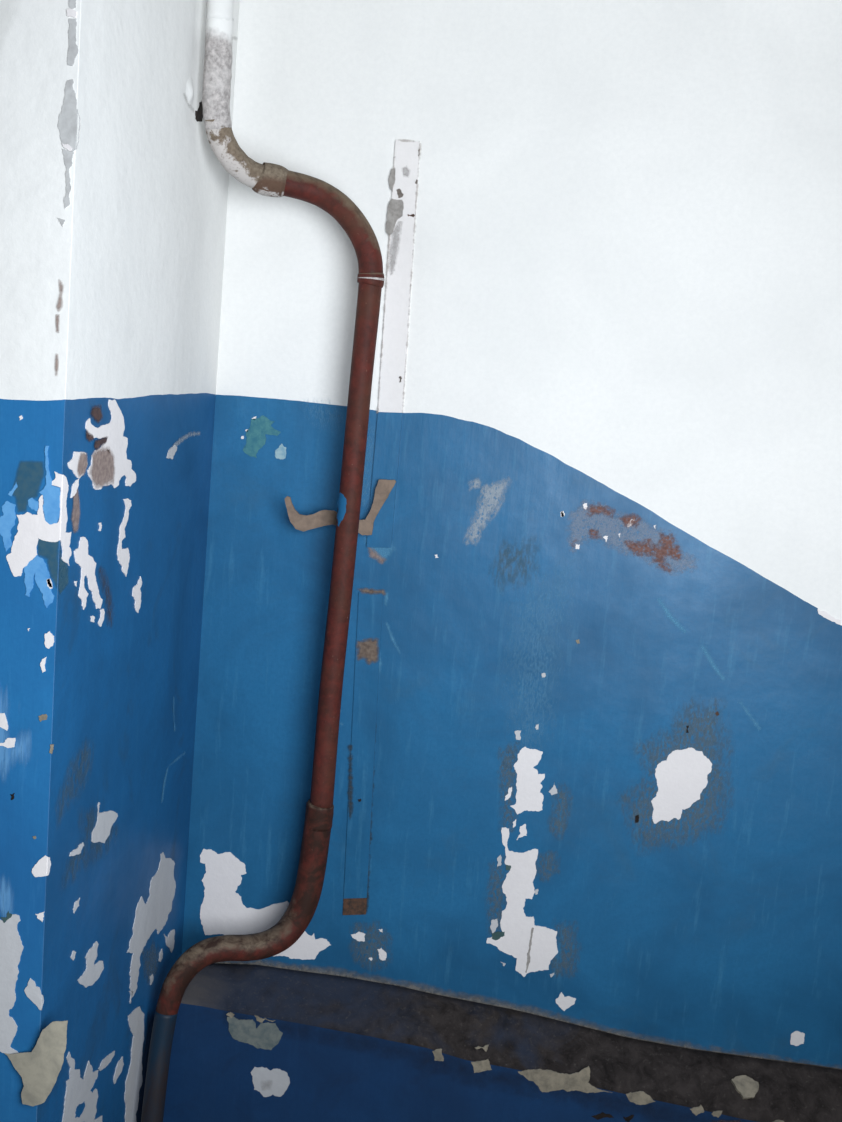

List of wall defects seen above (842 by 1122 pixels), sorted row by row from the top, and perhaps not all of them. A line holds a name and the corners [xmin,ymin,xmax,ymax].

spalling [58,0,80,227]
peeling [0,399,142,627]
rust [560,502,694,571]
spalling [40,631,54,673]
peeling [625,704,722,842]
peeling [69,802,118,856]
peeling [200,849,289,935]
peeling [486,730,572,977]
peeling [0,852,176,1122]
peeling [275,931,330,960]
peeling [518,1066,612,1093]
peeling [790,1031,805,1046]